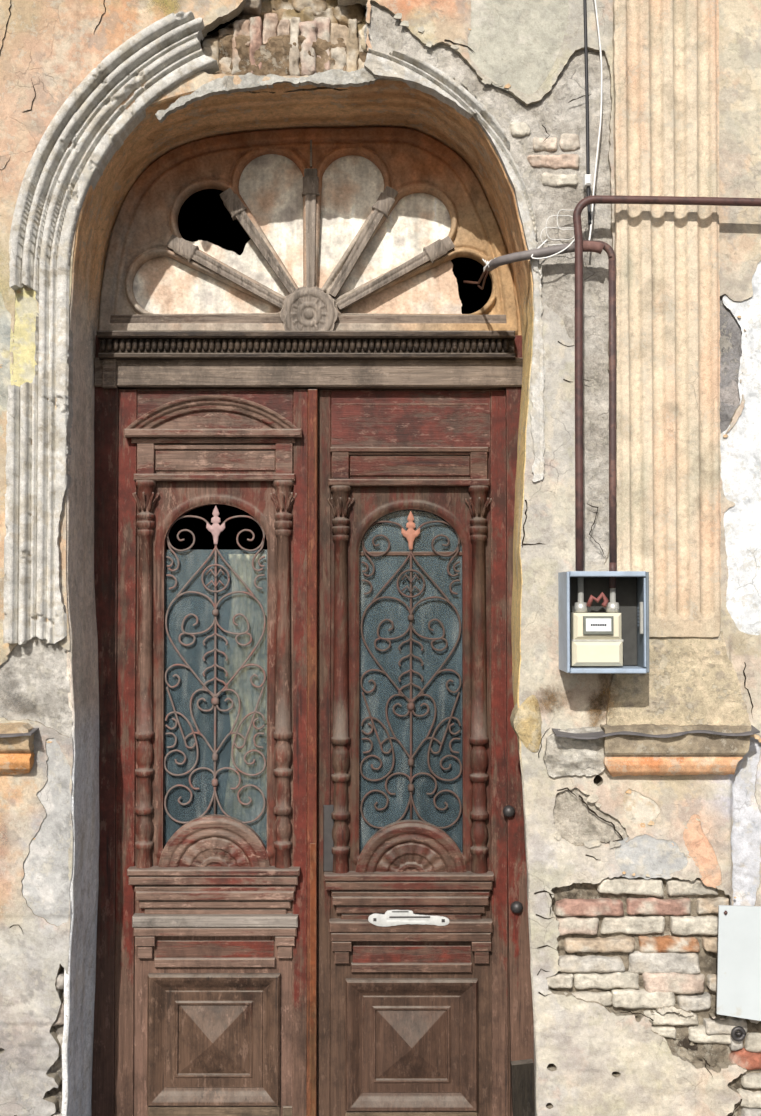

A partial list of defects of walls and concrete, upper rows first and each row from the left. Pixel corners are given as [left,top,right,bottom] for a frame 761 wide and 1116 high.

crack [0,0,12,53]
peeling [0,287,39,436]
spalling [200,0,612,566]
peeling [719,261,761,635]
spalling [546,734,761,1116]